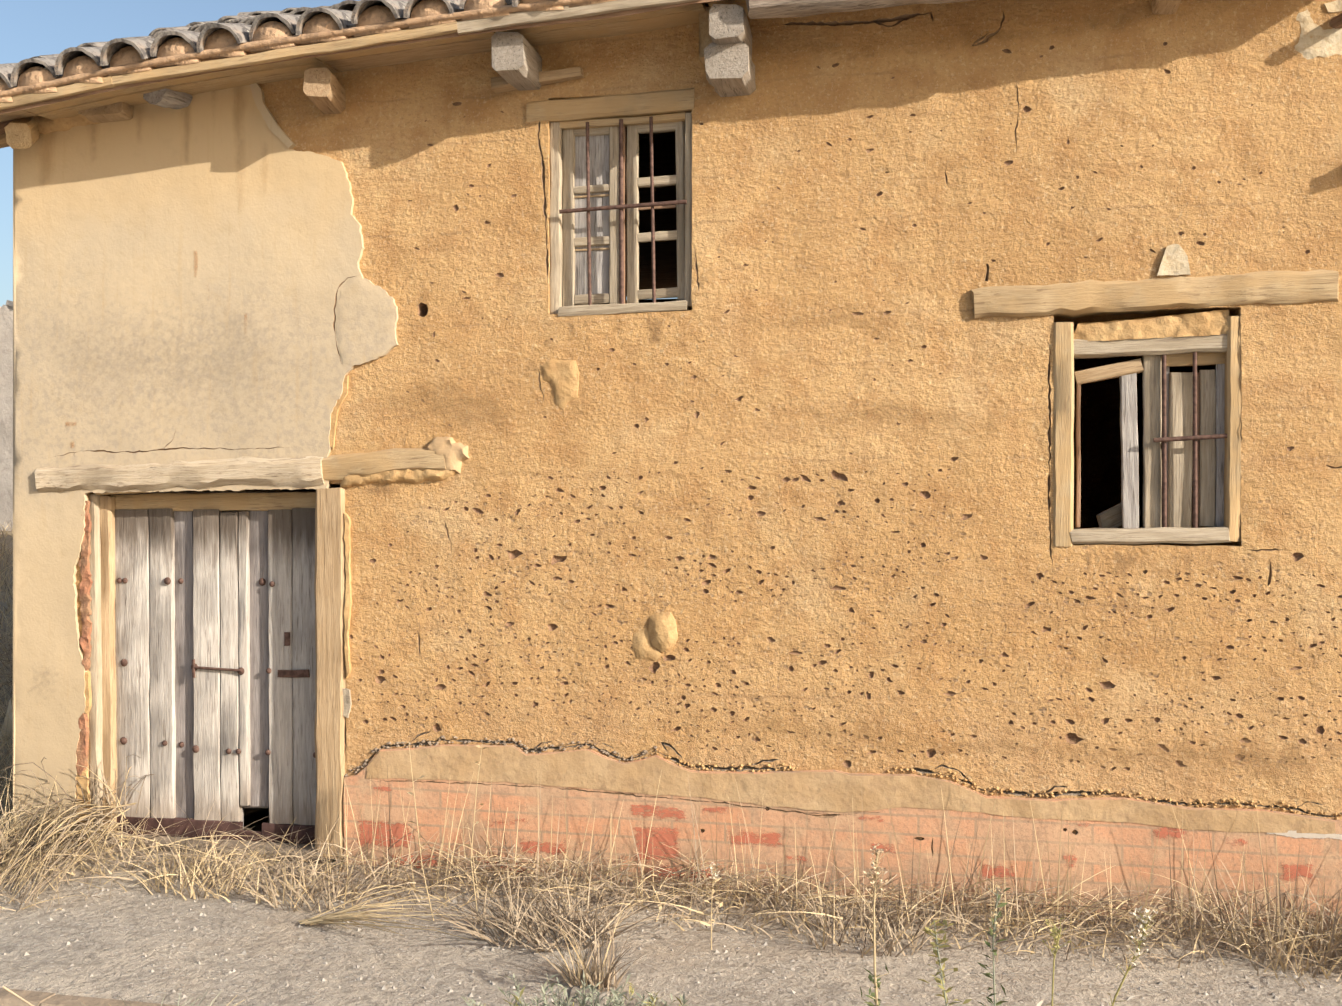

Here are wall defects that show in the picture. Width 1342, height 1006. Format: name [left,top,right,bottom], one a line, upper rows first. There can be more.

peeling [1324,0,1342,13]
peeling [0,83,398,843]
crack [344,728,904,818]
crack [883,764,1342,820]
spalling [359,820,438,868]
spalling [484,841,566,873]
spalling [631,805,712,881]
spalling [729,831,806,861]
spalling [982,865,1015,880]
spalling [1279,864,1313,881]